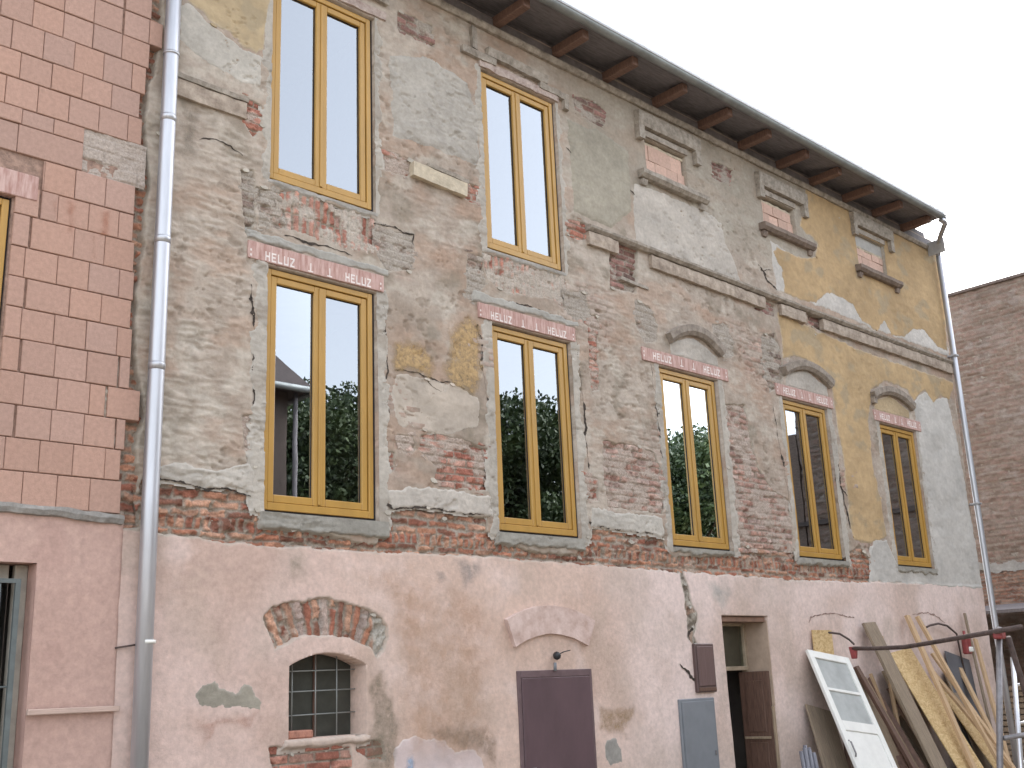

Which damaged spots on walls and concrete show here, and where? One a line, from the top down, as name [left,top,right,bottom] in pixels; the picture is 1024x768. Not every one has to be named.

flaking render [242,93,266,136]
crack [248,284,256,330]
flaking render [238,168,418,274]
peeling [773,190,947,351]
peeling [158,302,953,583]
crack [575,333,590,468]
crack [834,442,851,529]
crack [677,567,697,681]
peeling [196,681,261,710]